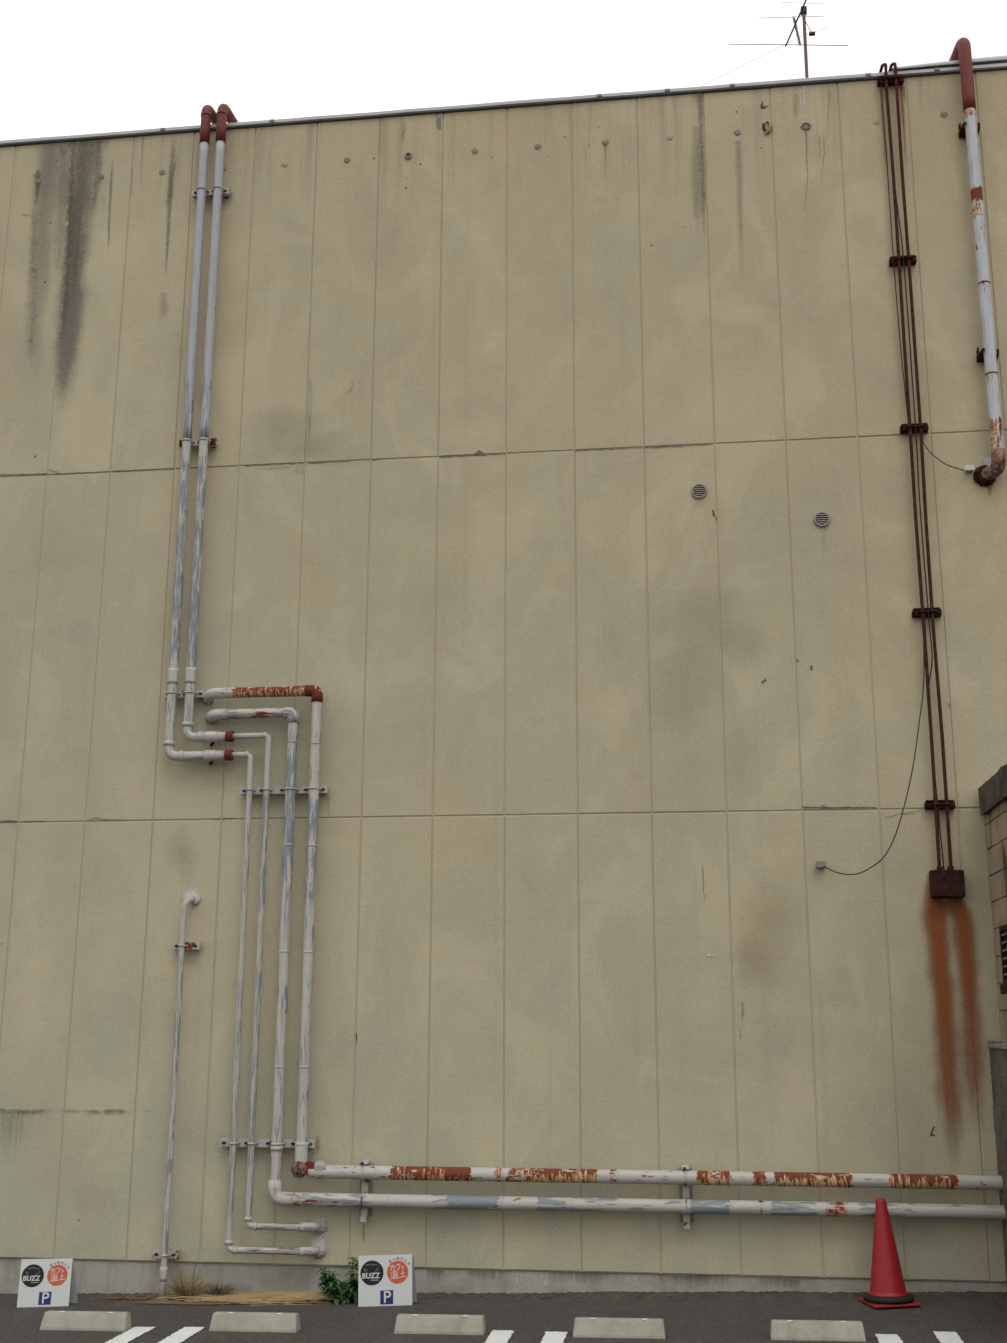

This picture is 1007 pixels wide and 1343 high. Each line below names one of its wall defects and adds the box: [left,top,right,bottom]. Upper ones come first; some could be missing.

rust [926,885,977,1115]